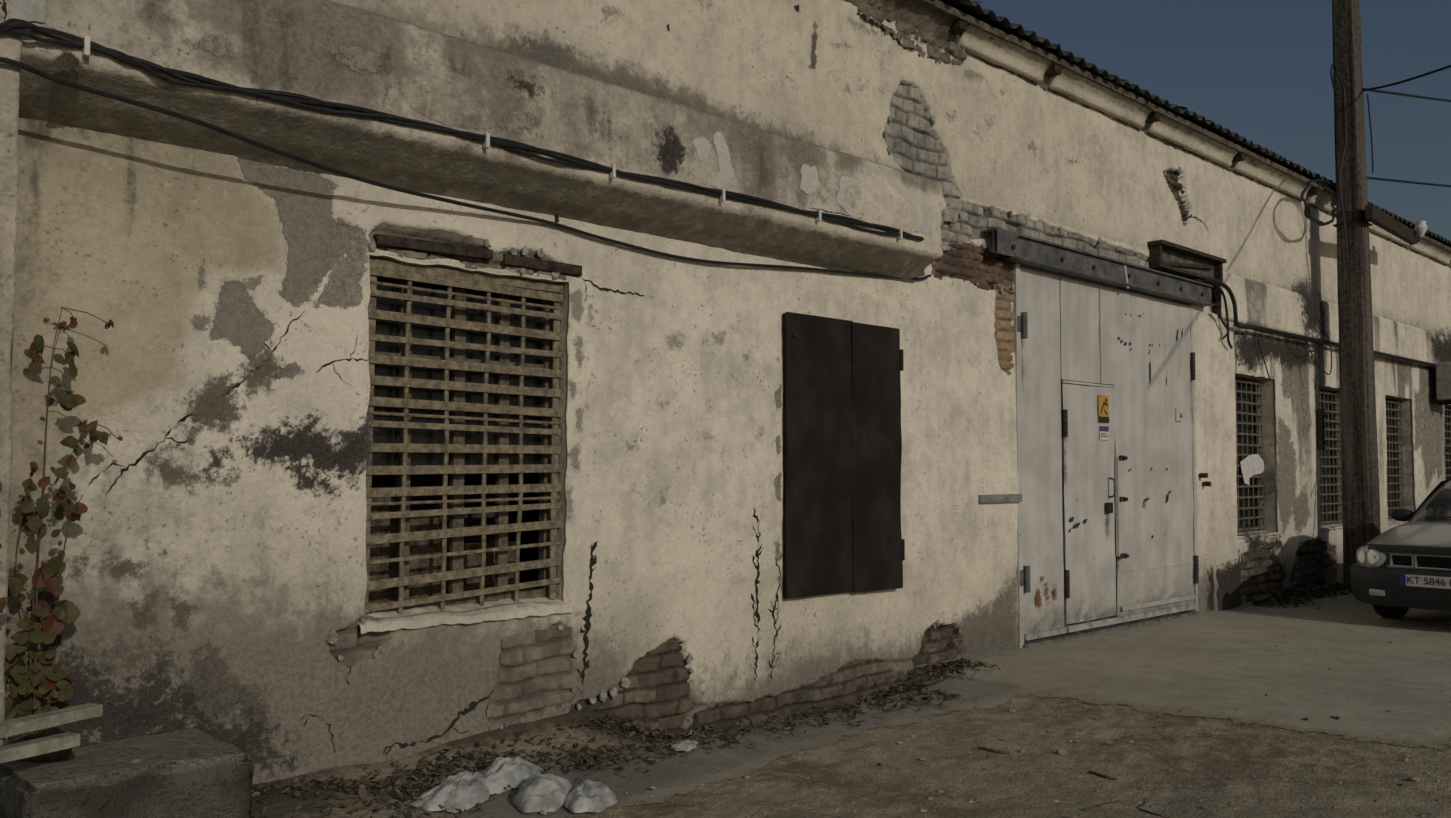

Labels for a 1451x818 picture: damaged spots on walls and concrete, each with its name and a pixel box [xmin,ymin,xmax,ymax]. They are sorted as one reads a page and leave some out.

damp [490,36,815,144]
damp [653,126,687,174]
flaking render [846,83,1158,376]
flaking render [189,259,275,359]
crack [226,311,305,395]
crack [316,333,370,386]
flaking render [237,158,593,469]
damp [1233,274,1327,376]
crack [89,413,192,496]
damp [145,342,377,500]
crack [577,541,598,694]
flaking render [486,619,963,736]